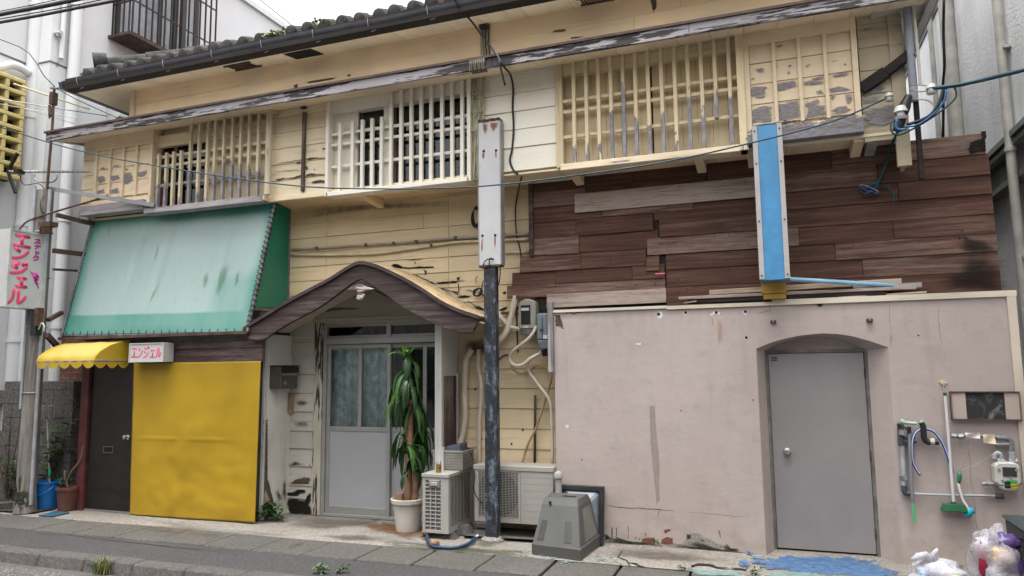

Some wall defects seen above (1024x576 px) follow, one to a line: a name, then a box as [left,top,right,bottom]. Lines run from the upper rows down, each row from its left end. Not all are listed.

peeling [750,60,894,127]
peeling [97,165,147,194]
leakage [948,239,996,288]
crack [613,506,742,567]